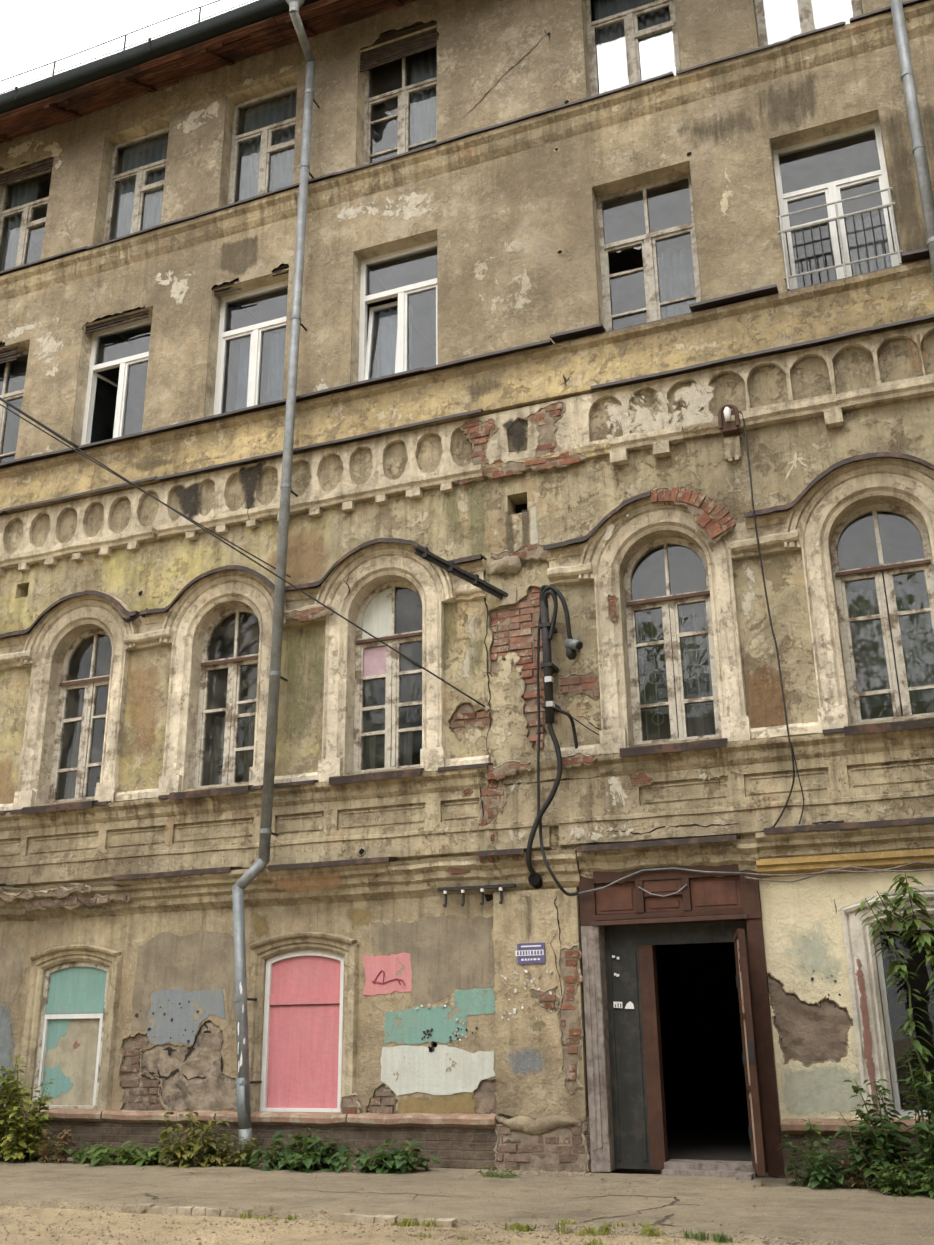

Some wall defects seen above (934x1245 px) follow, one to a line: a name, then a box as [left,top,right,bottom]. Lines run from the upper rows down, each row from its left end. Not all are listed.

peeling [174,101,220,133]
peeling [337,192,435,222]
peeling [155,270,194,304]
peeling [604,382,714,440]
spalling [458,401,587,485]
spalling [649,487,736,544]
crack [484,572,492,753]
spalling [559,672,600,701]
spalling [445,585,551,874]
spalling [0,884,131,911]
peeling [118,931,237,1111]
spalling [767,956,879,1114]